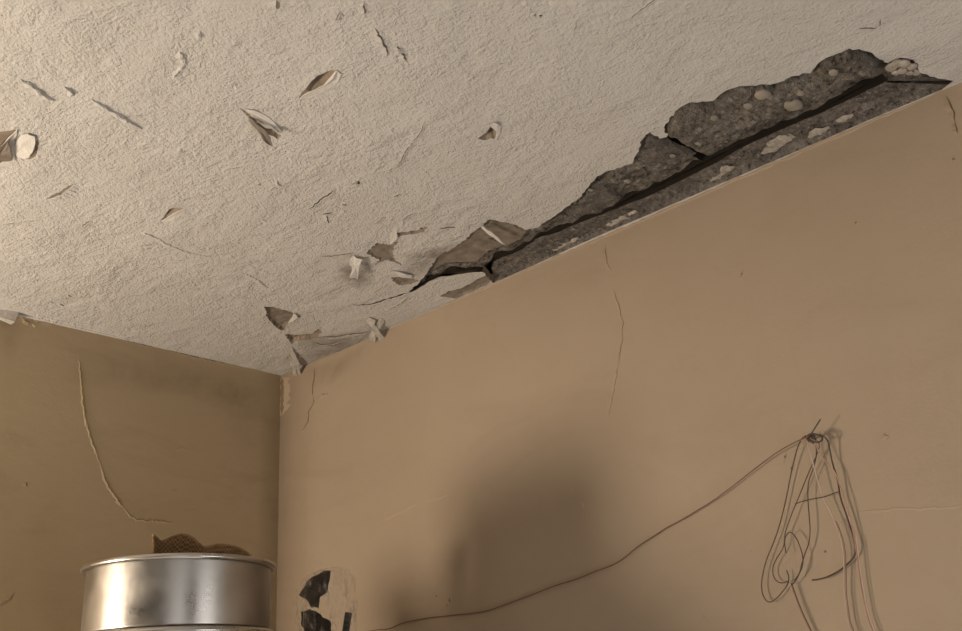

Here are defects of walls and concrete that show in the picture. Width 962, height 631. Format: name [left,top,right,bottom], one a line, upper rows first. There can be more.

peeling [299,70,342,99]
peeling [0,130,39,168]
peeling [240,108,283,147]
spalling [349,48,952,324]
peeling [264,306,322,377]
crack [78,359,174,524]